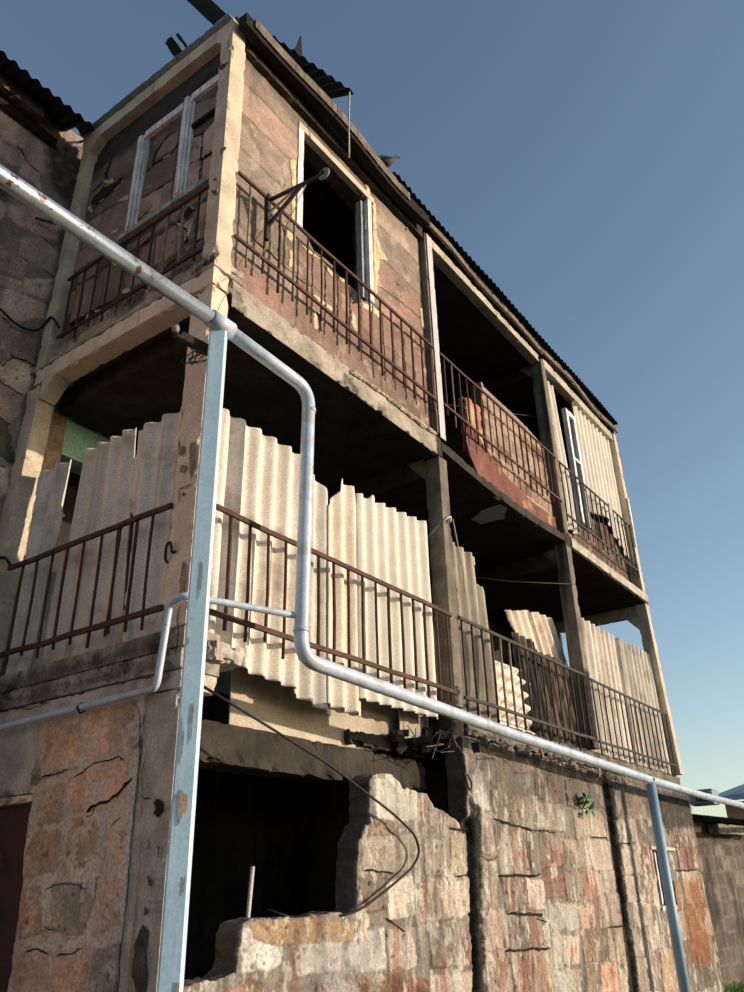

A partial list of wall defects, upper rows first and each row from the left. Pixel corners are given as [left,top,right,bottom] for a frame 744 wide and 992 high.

spalling [88,176,129,212]
flaking render [472,504,507,524]
water stain [0,636,175,711]
crack [41,707,151,992]
peeling [153,789,188,857]
spalling [131,907,148,992]